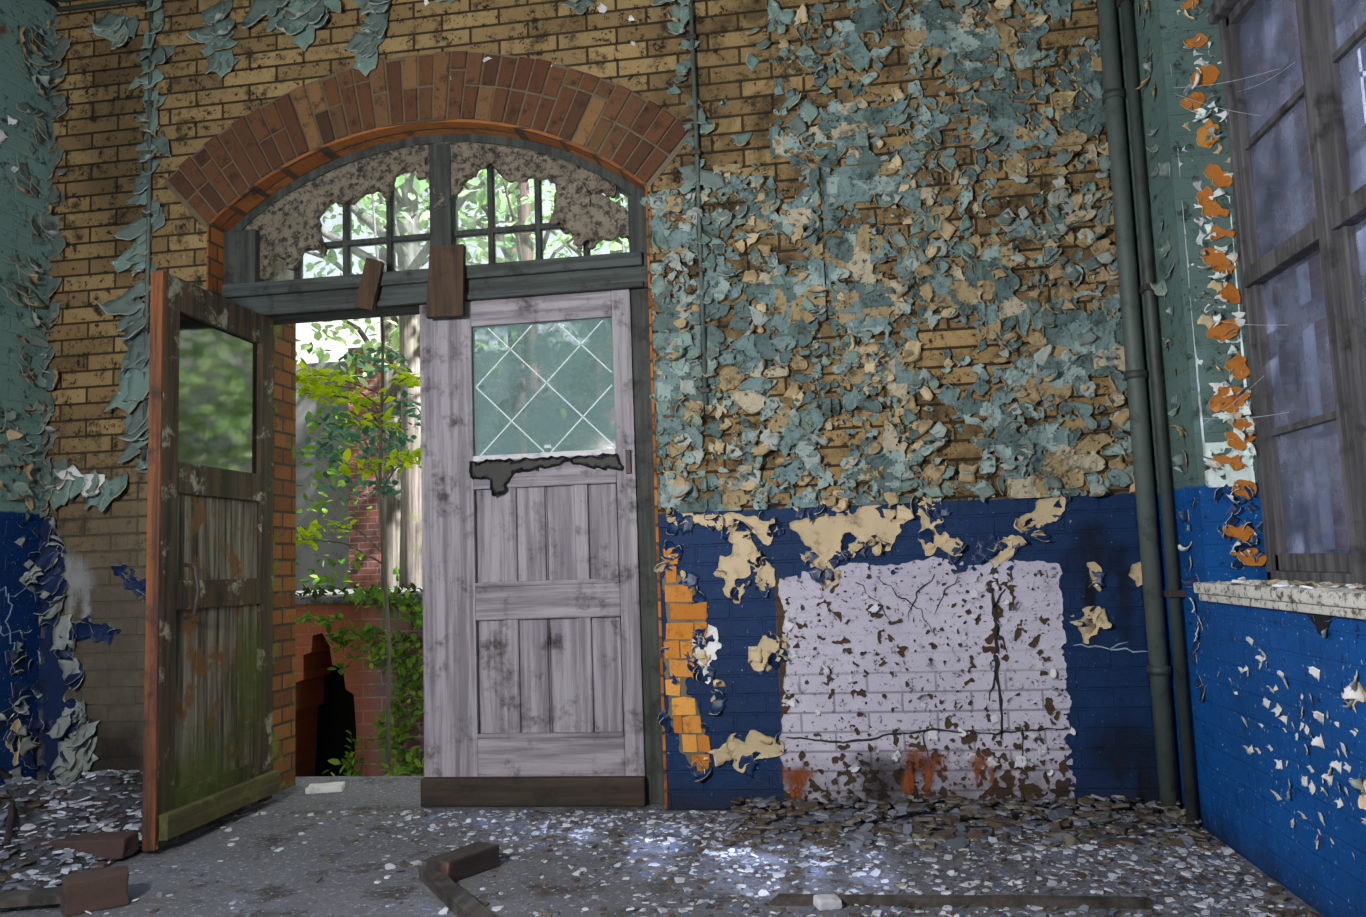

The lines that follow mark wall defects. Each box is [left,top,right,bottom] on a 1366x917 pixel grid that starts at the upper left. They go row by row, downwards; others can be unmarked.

peeling [1135,48,1156,102]
peeling [0,0,390,784]
peeling [640,0,1135,782]
peeling [1146,0,1267,569]
crack [0,586,32,650]
peeling [1128,562,1143,587]
peeling [1176,498,1366,849]